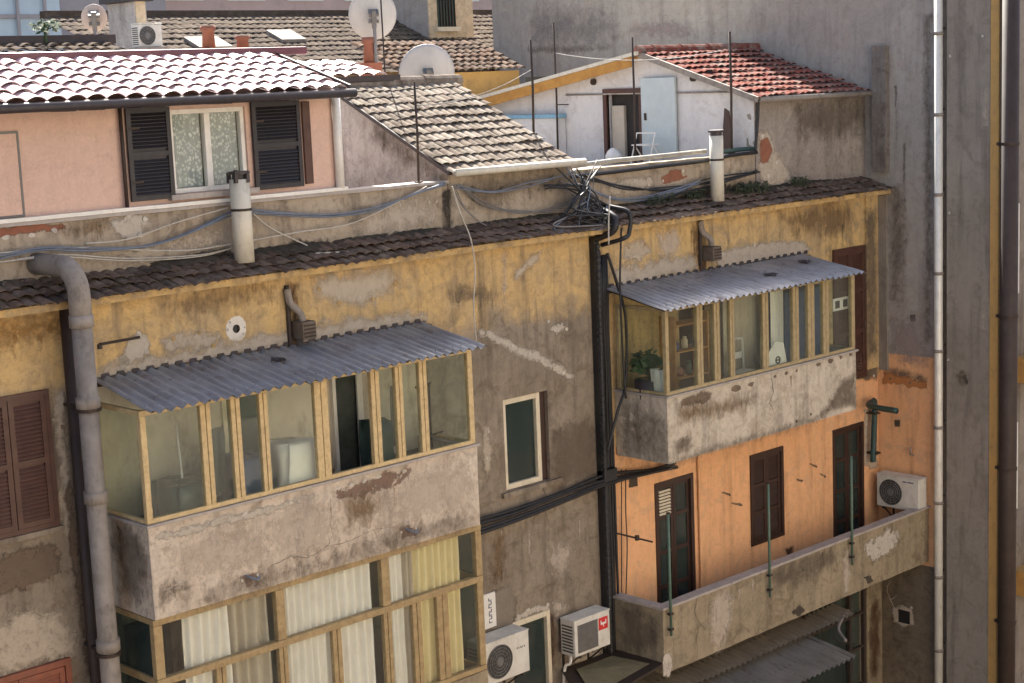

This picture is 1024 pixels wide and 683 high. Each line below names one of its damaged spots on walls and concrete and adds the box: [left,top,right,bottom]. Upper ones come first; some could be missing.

flaking render [758,131,792,186]
flaking render [609,170,687,196]
peeling [682,391,711,406]
damp [681,398,749,419]
flaking render [816,353,927,469]
flaking render [336,467,411,499]
crack [271,524,390,567]
peeling [864,527,900,561]
peeling [0,480,90,676]